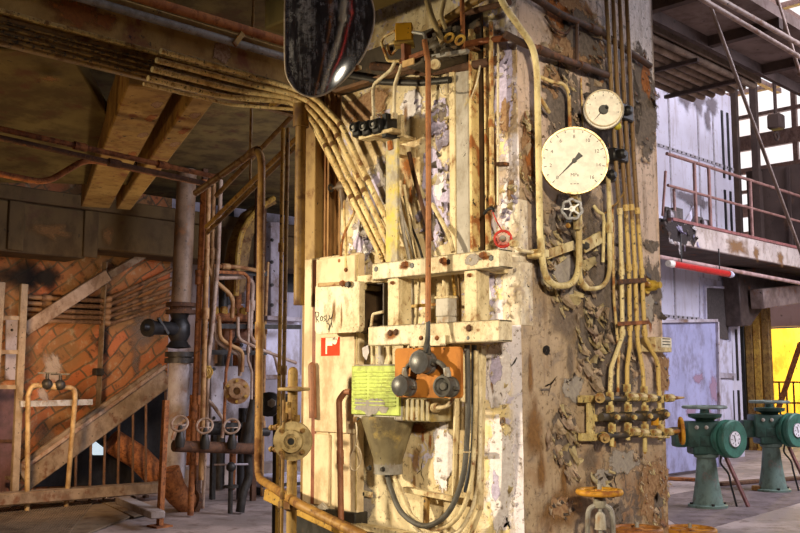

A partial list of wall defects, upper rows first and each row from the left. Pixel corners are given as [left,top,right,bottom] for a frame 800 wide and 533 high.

peeling [400,89,450,251]
damp [38,267,58,290]
peeling [494,0,672,533]
peeling [485,342,516,533]